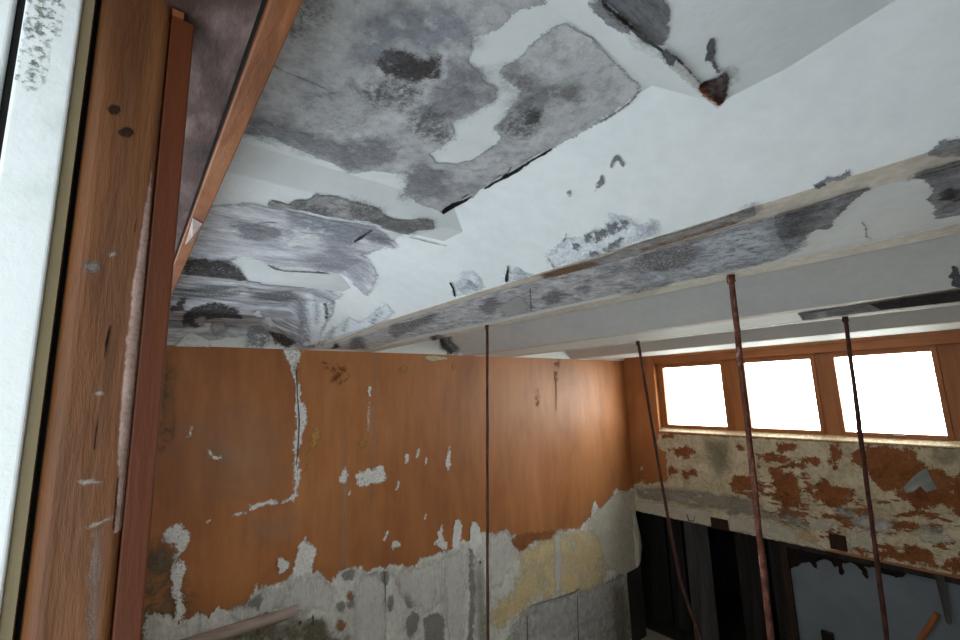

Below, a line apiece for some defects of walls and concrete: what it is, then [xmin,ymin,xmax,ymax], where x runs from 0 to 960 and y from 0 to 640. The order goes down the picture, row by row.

mould [15,0,61,89]
corrosion [697,73,729,106]
crack [442,148,552,214]
peeling [167,0,870,516]
water stain [299,300,330,346]
peeling [142,433,960,640]